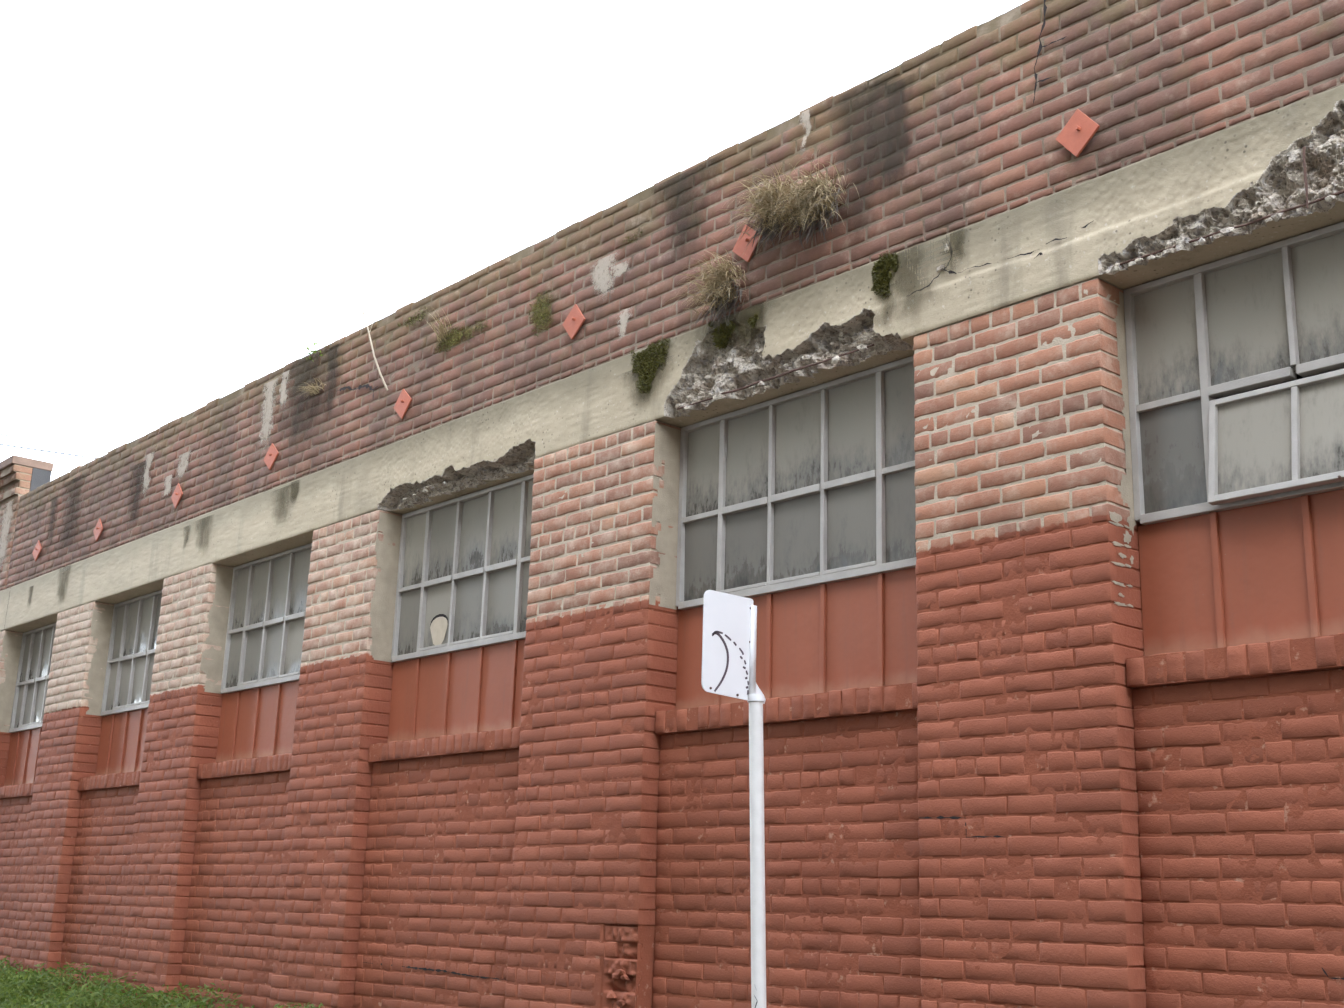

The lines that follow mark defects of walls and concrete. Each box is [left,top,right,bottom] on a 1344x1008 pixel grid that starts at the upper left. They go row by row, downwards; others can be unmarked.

spalling [1098,99,1344,275]
spalling [664,308,913,418]
spalling [378,439,536,511]